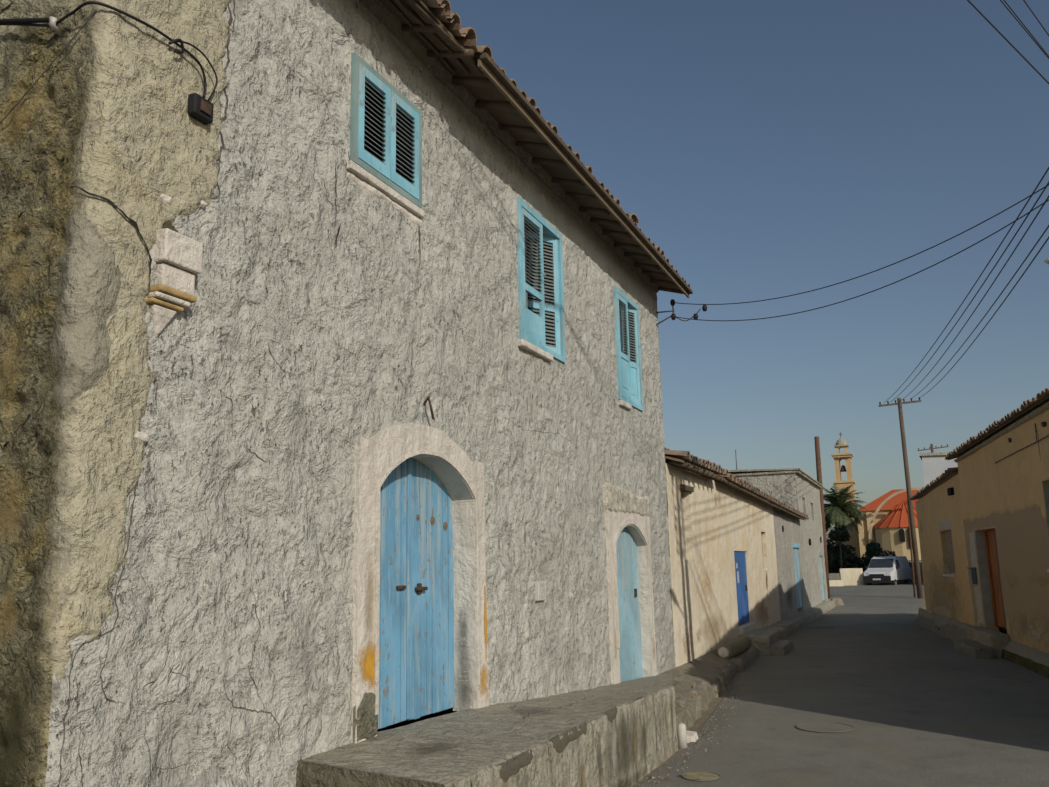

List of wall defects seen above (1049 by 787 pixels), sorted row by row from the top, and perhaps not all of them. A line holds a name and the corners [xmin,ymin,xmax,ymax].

crack [196,0,335,214]
crack [58,479,193,787]
leakage [963,507,1049,649]